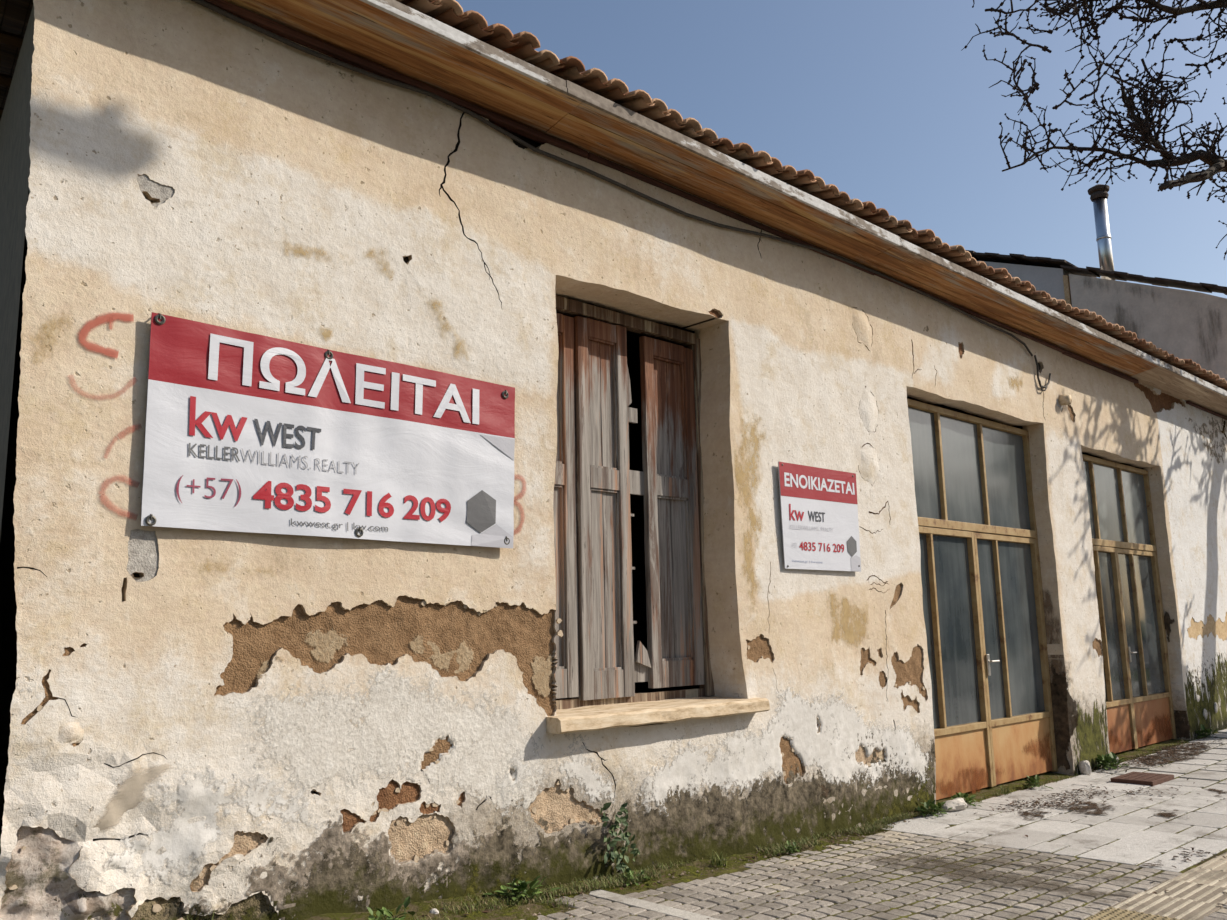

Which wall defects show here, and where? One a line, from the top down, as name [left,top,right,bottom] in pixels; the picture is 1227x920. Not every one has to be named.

spalling [138,174,175,206]
crack [439,112,502,308]
flaking render [17,669,59,725]
flaking render [746,634,775,663]
flaking render [860,644,928,713]
water stain [1164,612,1175,642]
water stain [1174,652,1227,740]
flaking render [1187,612,1227,641]
peeling [94,595,616,920]
peeling [635,687,932,815]
water stain [142,729,936,920]
water stain [35,868,123,920]